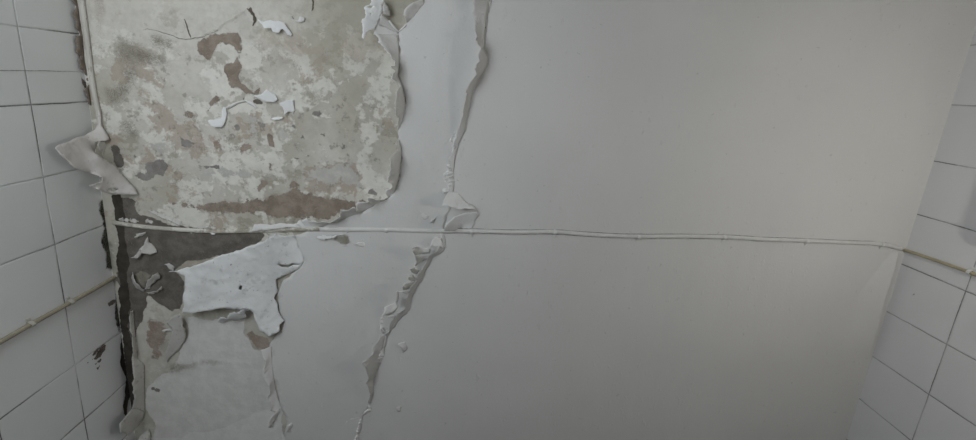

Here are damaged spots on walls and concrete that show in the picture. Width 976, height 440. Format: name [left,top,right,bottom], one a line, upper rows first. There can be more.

leakage [93,0,177,105]
leakage [197,32,260,95]
flaking render [55,0,491,440]